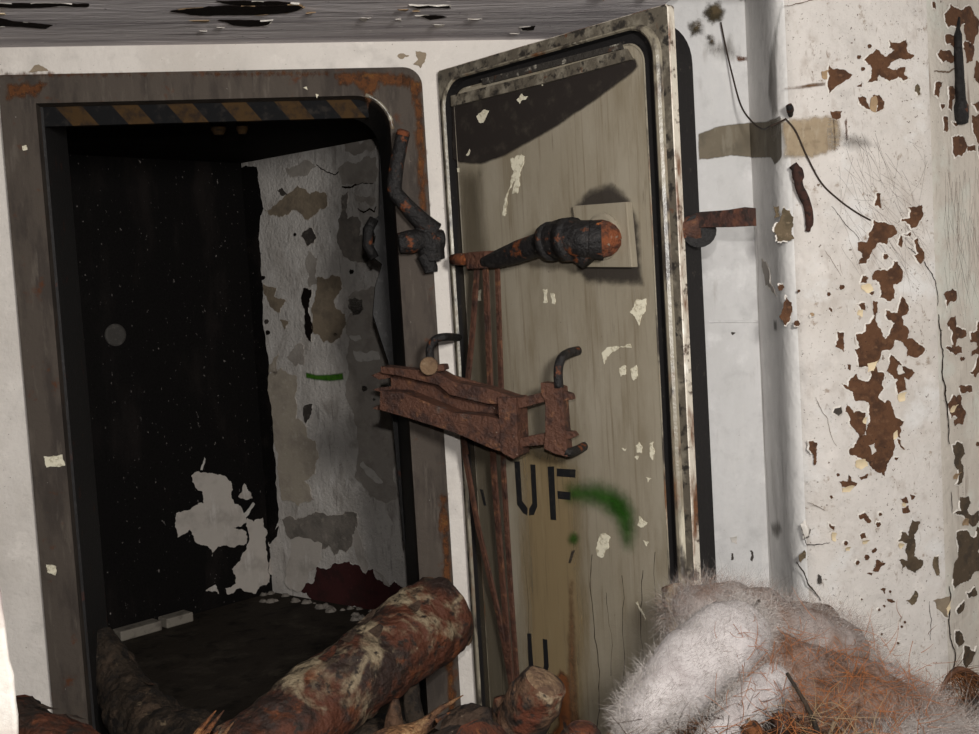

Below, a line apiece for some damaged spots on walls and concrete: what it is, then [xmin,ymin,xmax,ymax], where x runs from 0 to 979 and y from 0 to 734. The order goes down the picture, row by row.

spalling [0,2,89,29]
spalling [170,0,316,32]
rust [215,71,428,211]
peeling [802,37,979,159]
peeling [931,0,979,83]
peeling [772,206,794,243]
peeling [174,138,403,610]
peeling [761,258,815,328]
peeling [828,192,926,500]
peeling [943,289,979,426]
peeling [896,494,940,576]
peeling [929,440,979,640]